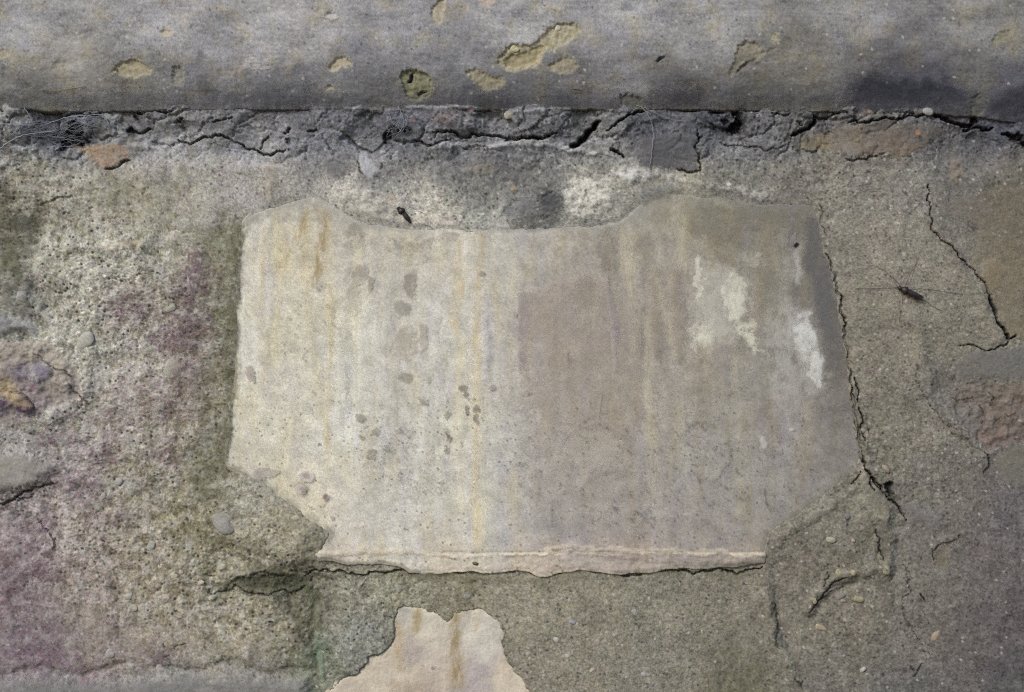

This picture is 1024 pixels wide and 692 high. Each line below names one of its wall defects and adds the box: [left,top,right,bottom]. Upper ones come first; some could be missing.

spalling [465,22,581,91]
spalling [728,33,780,77]
spalling [398,68,433,103]
water stain [850,71,966,114]
crack [181,117,317,157]
crack [415,111,643,158]
crack [677,111,1024,173]
efflorescence [565,178,606,216]
efflorescence [619,168,669,180]
water stain [690,182,842,396]
crack [926,185,1016,351]
peeling [325,602,529,692]